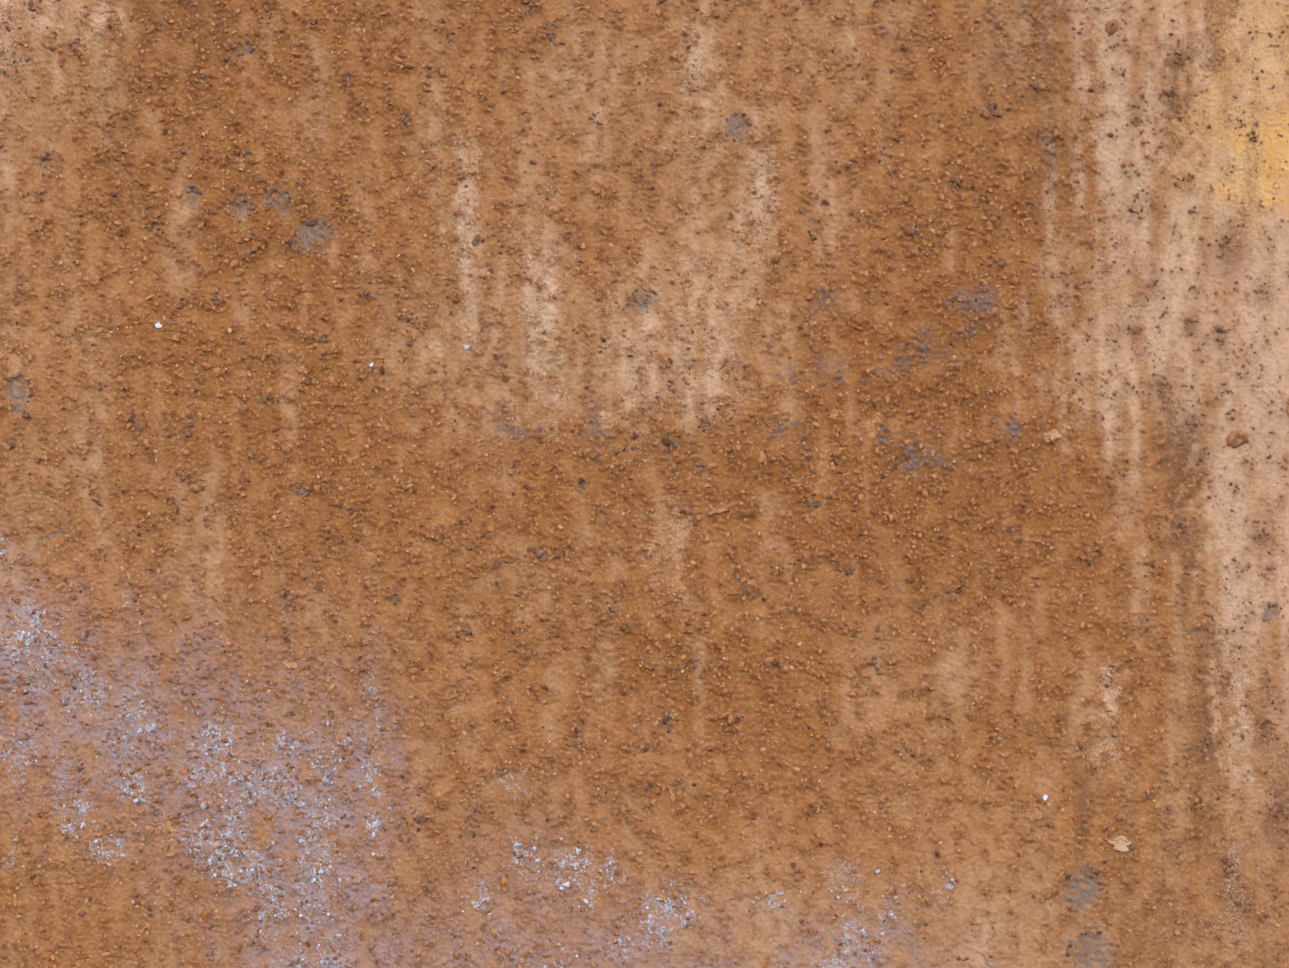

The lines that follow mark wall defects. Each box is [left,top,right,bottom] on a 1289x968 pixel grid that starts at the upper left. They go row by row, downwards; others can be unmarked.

corrosion [88,0,251,249]
corrosion [949,0,1085,297]
corrosion [1105,19,1120,35]
corrosion [1157,0,1246,190]
corrosion [1215,223,1245,258]
corrosion [614,408,720,462]
corrosion [1064,346,1289,968]
leakage [0,584,392,968]
leakage [493,769,536,804]
leakage [459,823,706,968]
leakage [755,879,802,916]
leakage [811,854,914,968]